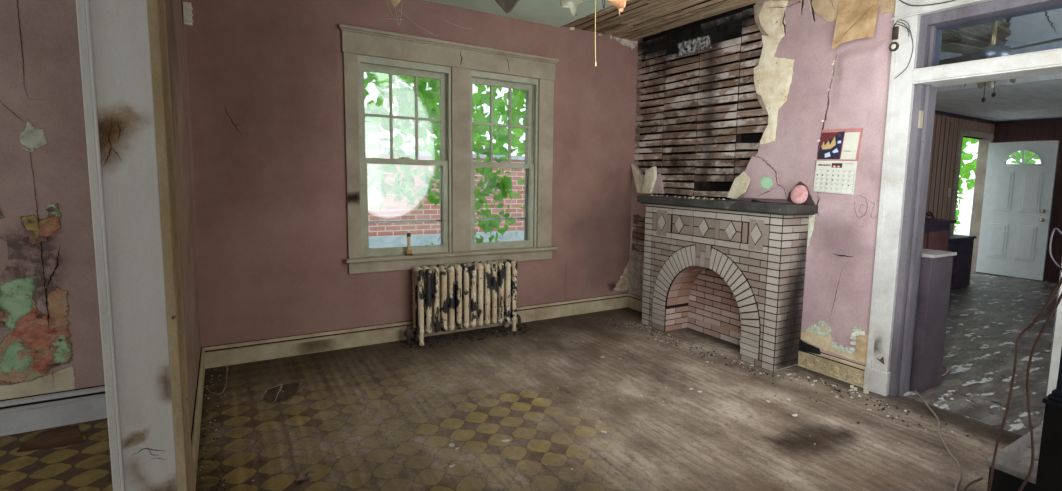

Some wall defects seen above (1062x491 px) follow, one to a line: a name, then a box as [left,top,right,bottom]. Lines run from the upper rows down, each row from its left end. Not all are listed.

flaking render [425,0,612,30]
peeling [877,0,896,15]
crack [0,0,39,122]
flaking render [599,0,839,197]
peeling [19,121,47,152]
crack [105,117,121,163]
peeling [21,203,61,244]
crack [29,151,60,380]
peeling [0,275,75,400]
peeling [798,320,868,384]